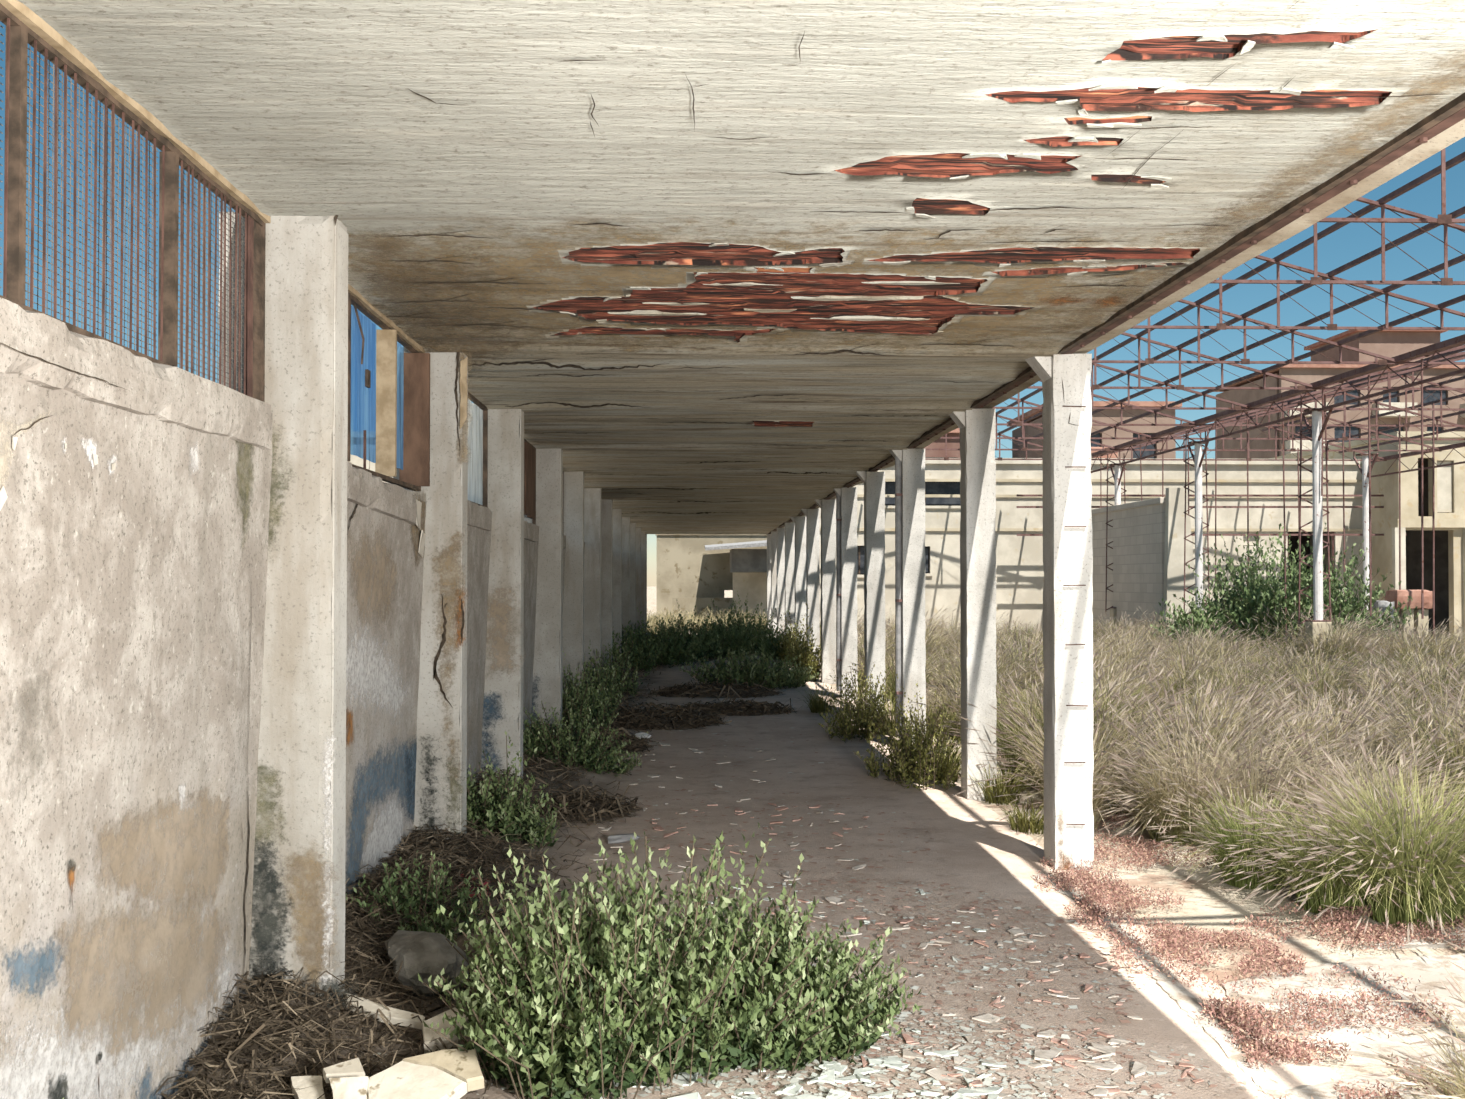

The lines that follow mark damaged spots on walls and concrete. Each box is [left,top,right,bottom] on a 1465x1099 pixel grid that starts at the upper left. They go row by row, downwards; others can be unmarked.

spalling [1096,31,1364,64]
spalling [841,84,1390,189]
spalling [906,198,989,219]
spalling [537,242,1200,341]
crack [1,343,127,390]
crack [11,414,53,437]
crack [433,594,452,707]
damp [0,532,410,1099]
rust [68,859,76,909]